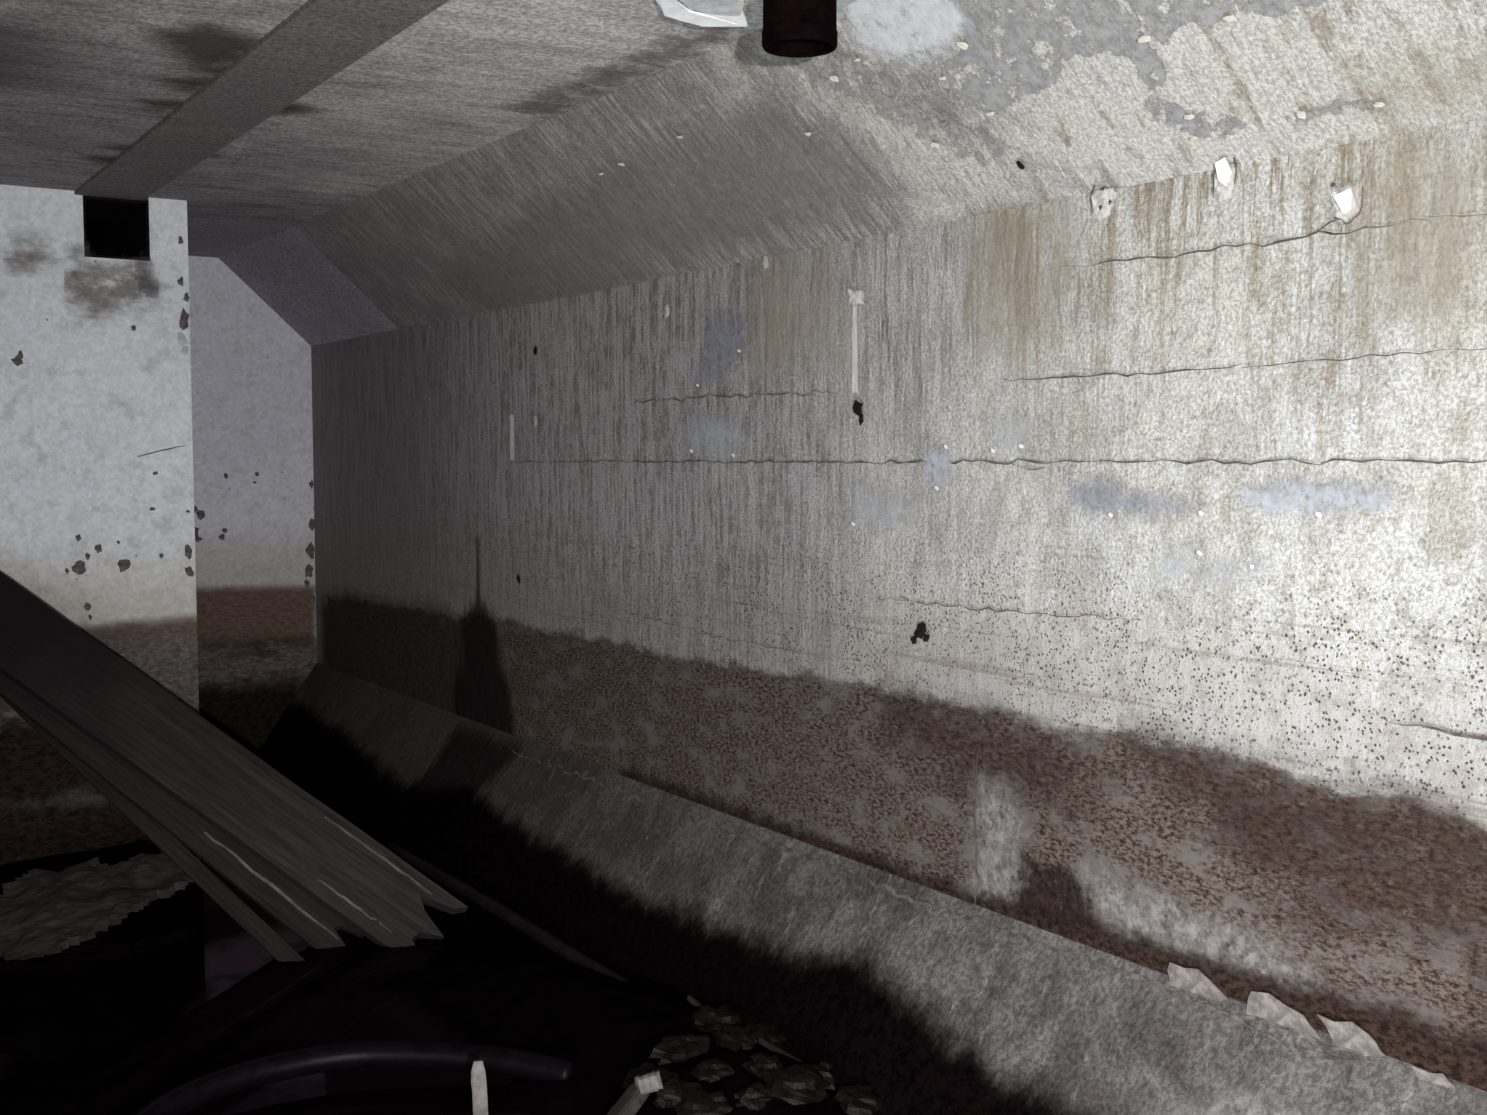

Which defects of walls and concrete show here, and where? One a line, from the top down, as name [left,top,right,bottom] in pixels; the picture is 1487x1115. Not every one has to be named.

peeling [826,0,1327,164]
peeling [1286,100,1385,122]
peeling [1215,157,1232,186]
crack [1212,157,1237,198]
crack [1062,186,1484,267]
leakage [70,266,157,312]
crack [1002,348,1487,381]
crack [509,421,1487,470]
crack [1389,722,1487,741]
leakage [79,548,1487,1048]